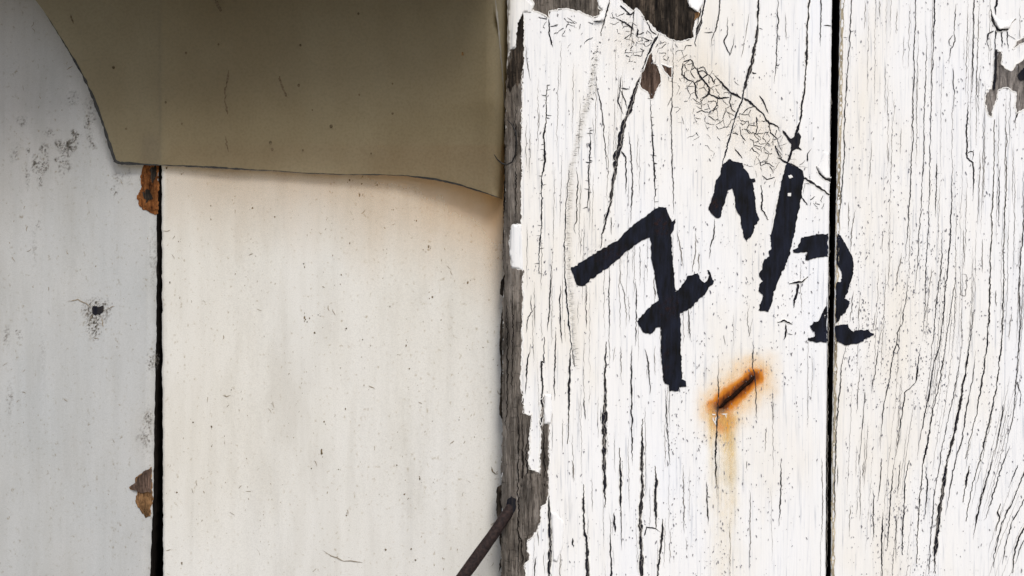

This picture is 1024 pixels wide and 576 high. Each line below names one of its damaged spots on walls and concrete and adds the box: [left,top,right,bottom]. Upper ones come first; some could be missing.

peeling [500,0,703,576]
peeling [644,221,819,576]
corrosion [706,367,765,443]
crack [525,0,1024,576]
peeling [844,135,1024,576]
peeling [937,13,1024,159]